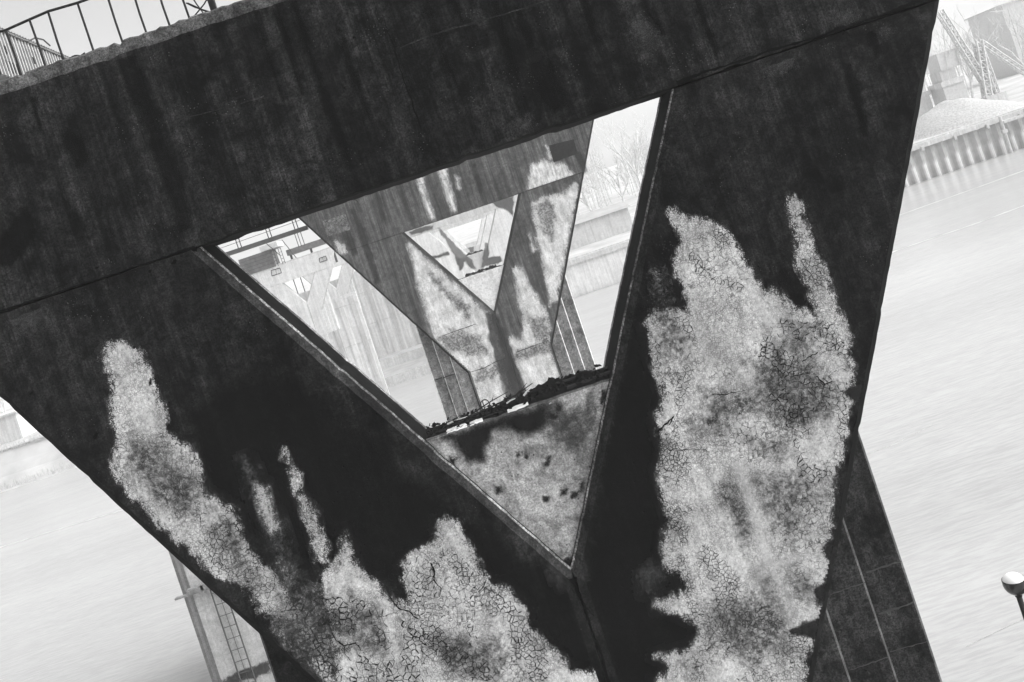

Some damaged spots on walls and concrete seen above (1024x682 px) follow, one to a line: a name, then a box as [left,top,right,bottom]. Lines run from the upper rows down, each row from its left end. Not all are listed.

water stain [761,248,809,311]
crack [658,416,705,451]
water stain [189,375,594,674]
crack [429,563,442,596]
crack [332,633,361,661]
crack [569,577,611,682]
water stain [221,661,272,682]